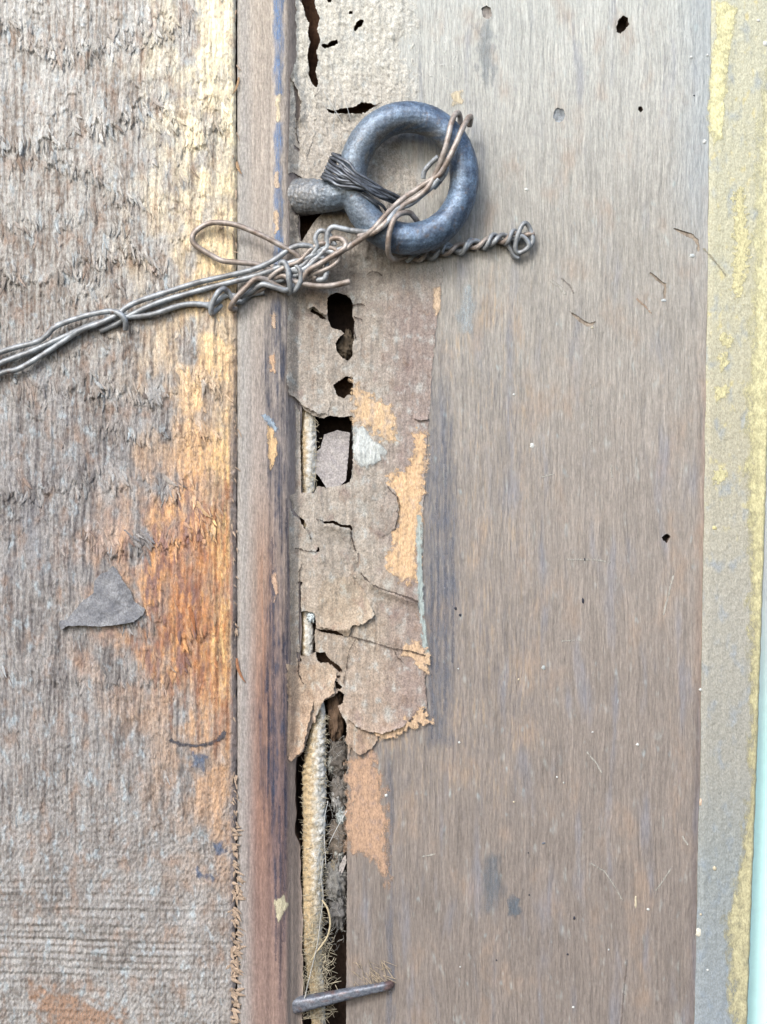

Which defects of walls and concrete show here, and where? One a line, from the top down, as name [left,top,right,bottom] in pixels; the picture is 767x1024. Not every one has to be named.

peeling [274,0,463,188]
peeling [367,133,449,223]
peeling [269,202,445,887]